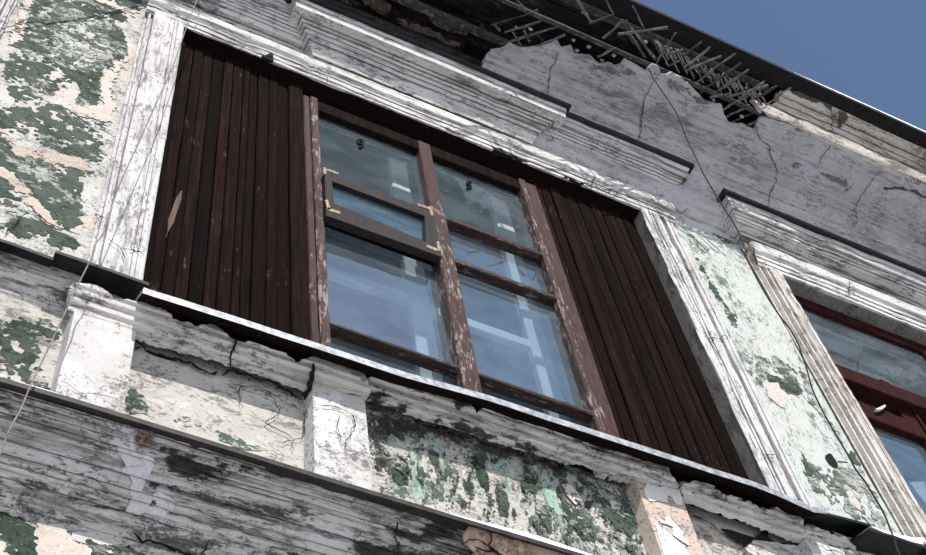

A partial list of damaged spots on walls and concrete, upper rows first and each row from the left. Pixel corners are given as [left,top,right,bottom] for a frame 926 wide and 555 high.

peeling [0,0,142,250]
crack [638,78,656,140]
crack [756,128,778,207]
peeling [0,316,62,390]
crack [135,339,361,450]
peeling [743,355,838,431]
flaking render [61,380,175,518]
peeling [366,413,648,555]
flaking render [0,511,146,555]
crack [133,532,210,555]
crack [393,522,401,555]
crack [463,532,502,555]